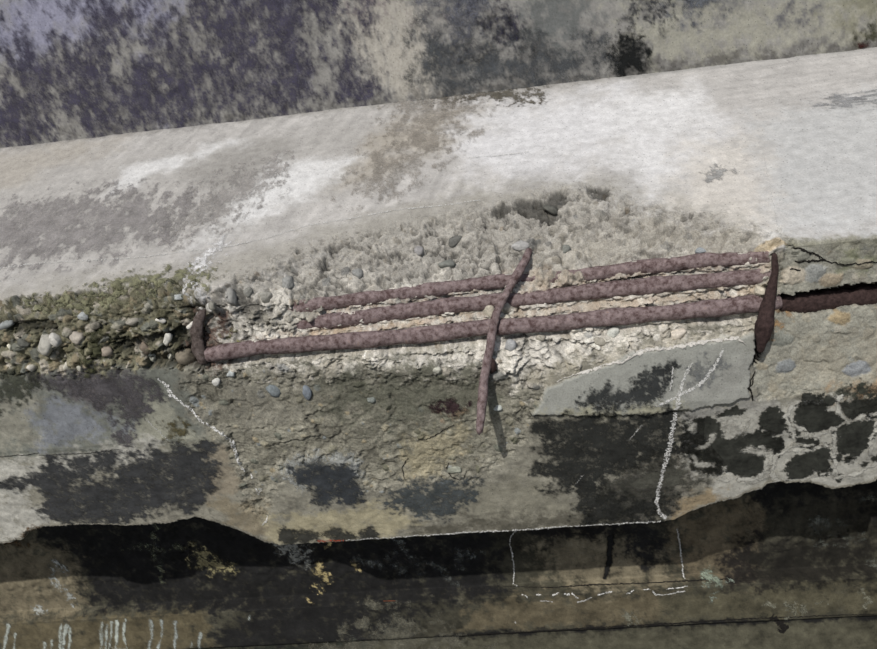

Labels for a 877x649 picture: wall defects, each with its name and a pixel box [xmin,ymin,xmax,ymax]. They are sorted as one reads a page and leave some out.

damp [0,0,387,148]
damp [354,0,716,200]
damp [814,89,877,107]
damp [705,164,737,183]
rust [203,310,233,348]
spalling [0,177,877,544]
rust [429,398,471,419]
damp [833,383,877,410]
damp [0,363,236,583]
damp [281,448,367,510]
damp [379,477,483,522]